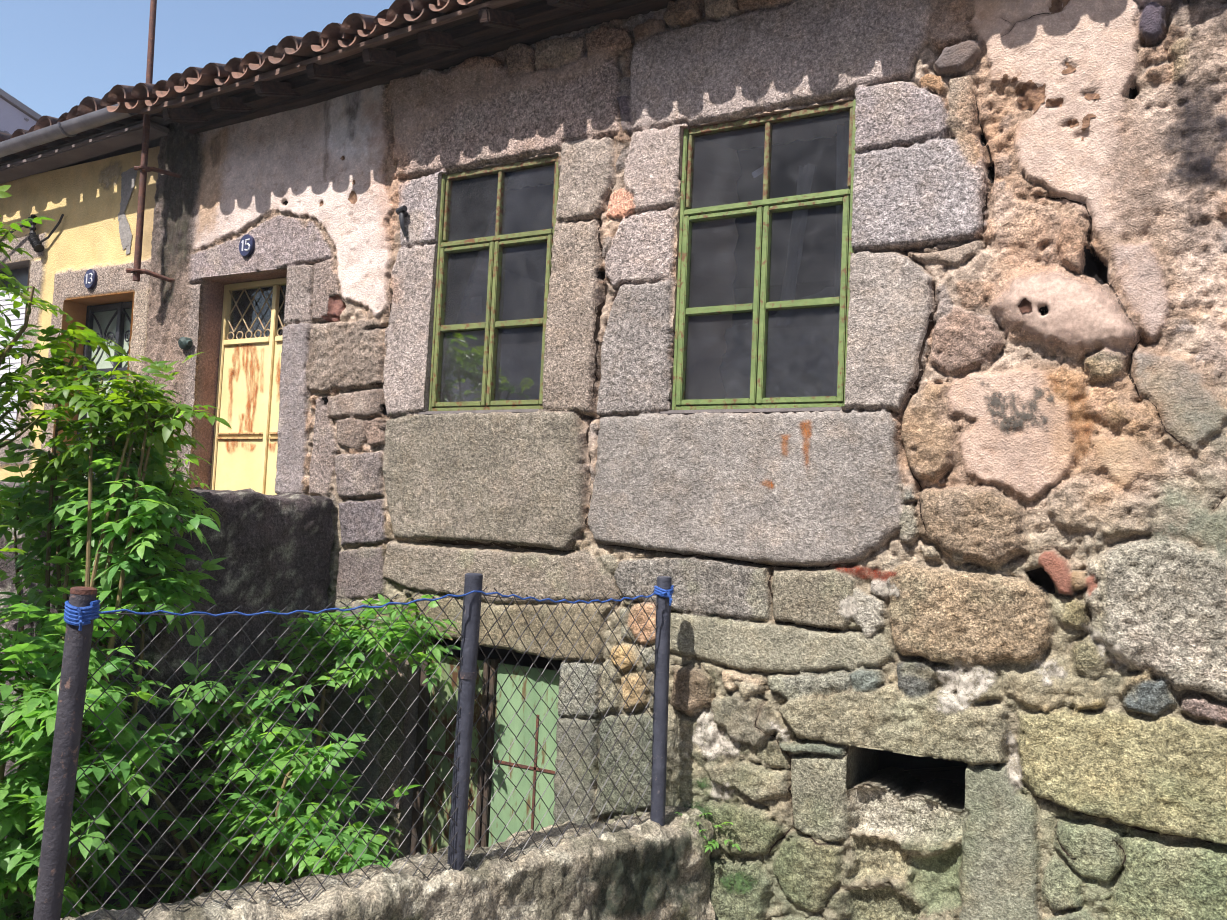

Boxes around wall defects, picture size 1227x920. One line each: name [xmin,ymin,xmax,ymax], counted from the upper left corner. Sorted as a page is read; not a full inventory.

spalling [1049,0,1070,14]
peeling [118,167,137,255]
damp [157,127,219,303]
crack [896,97,995,253]
spalling [1002,74,1063,114]
crack [1039,196,1096,256]
spalling [1068,93,1100,141]
damp [1168,84,1227,184]
rust [226,344,280,451]
crack [1107,283,1188,448]
rust [800,421,811,463]